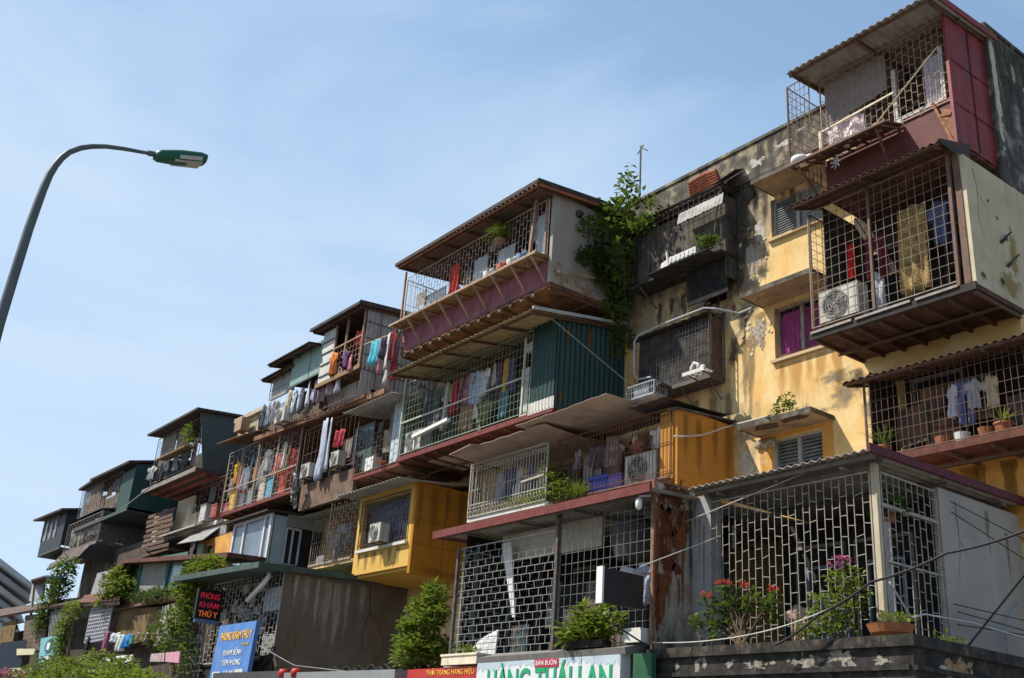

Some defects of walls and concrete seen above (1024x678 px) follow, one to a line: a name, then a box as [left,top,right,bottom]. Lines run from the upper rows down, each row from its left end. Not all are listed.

peeling [741,126,805,177]
damp [707,184,767,393]
damp [658,294,686,324]
peeling [741,317,773,357]
rust [653,476,693,642]
peeling [694,656,707,677]
peeling [725,649,857,674]
peeling [939,657,973,678]